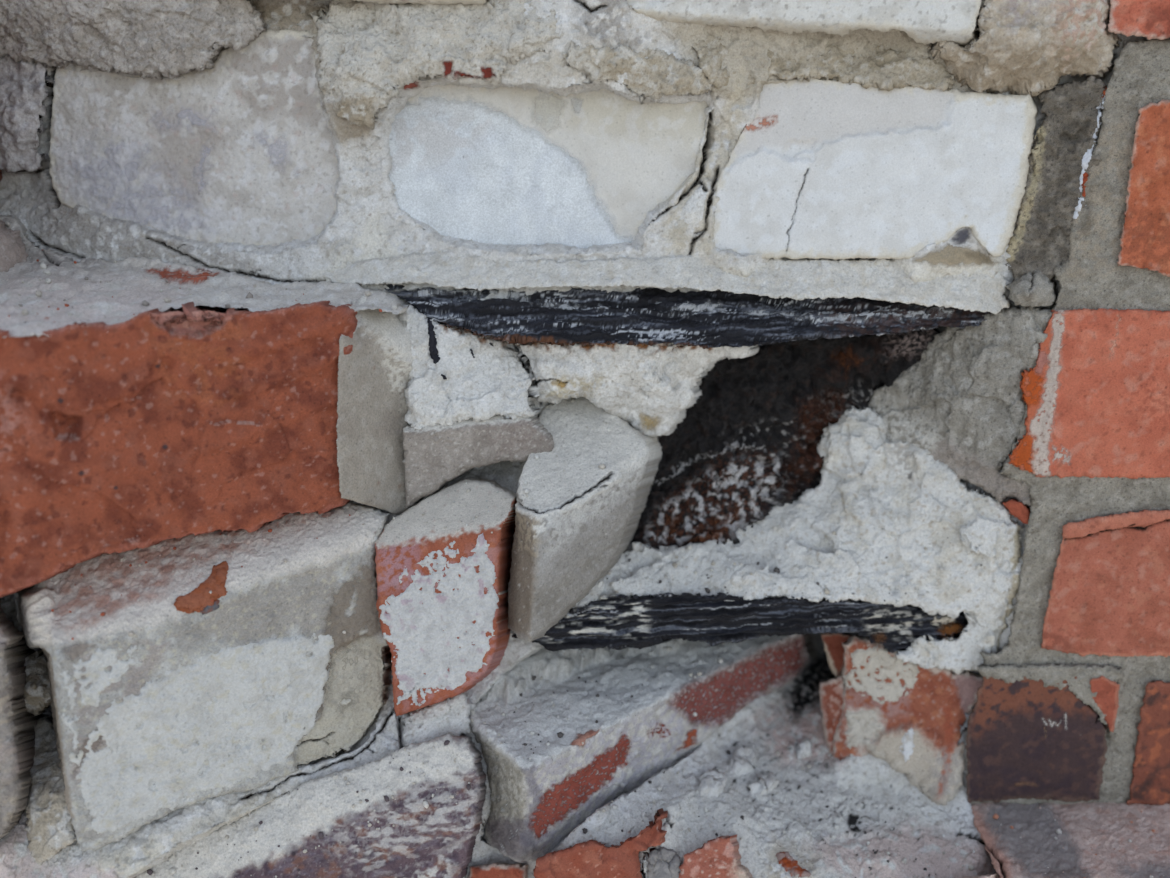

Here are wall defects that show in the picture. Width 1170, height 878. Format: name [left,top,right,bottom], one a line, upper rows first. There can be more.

crack [659,112,719,255]
crack [34,235,86,266]
crack [147,238,319,283]
corrosion [636,343,712,351]
spalling [631,328,940,549]
corrosion [784,397,843,491]
peeling [379,533,499,706]